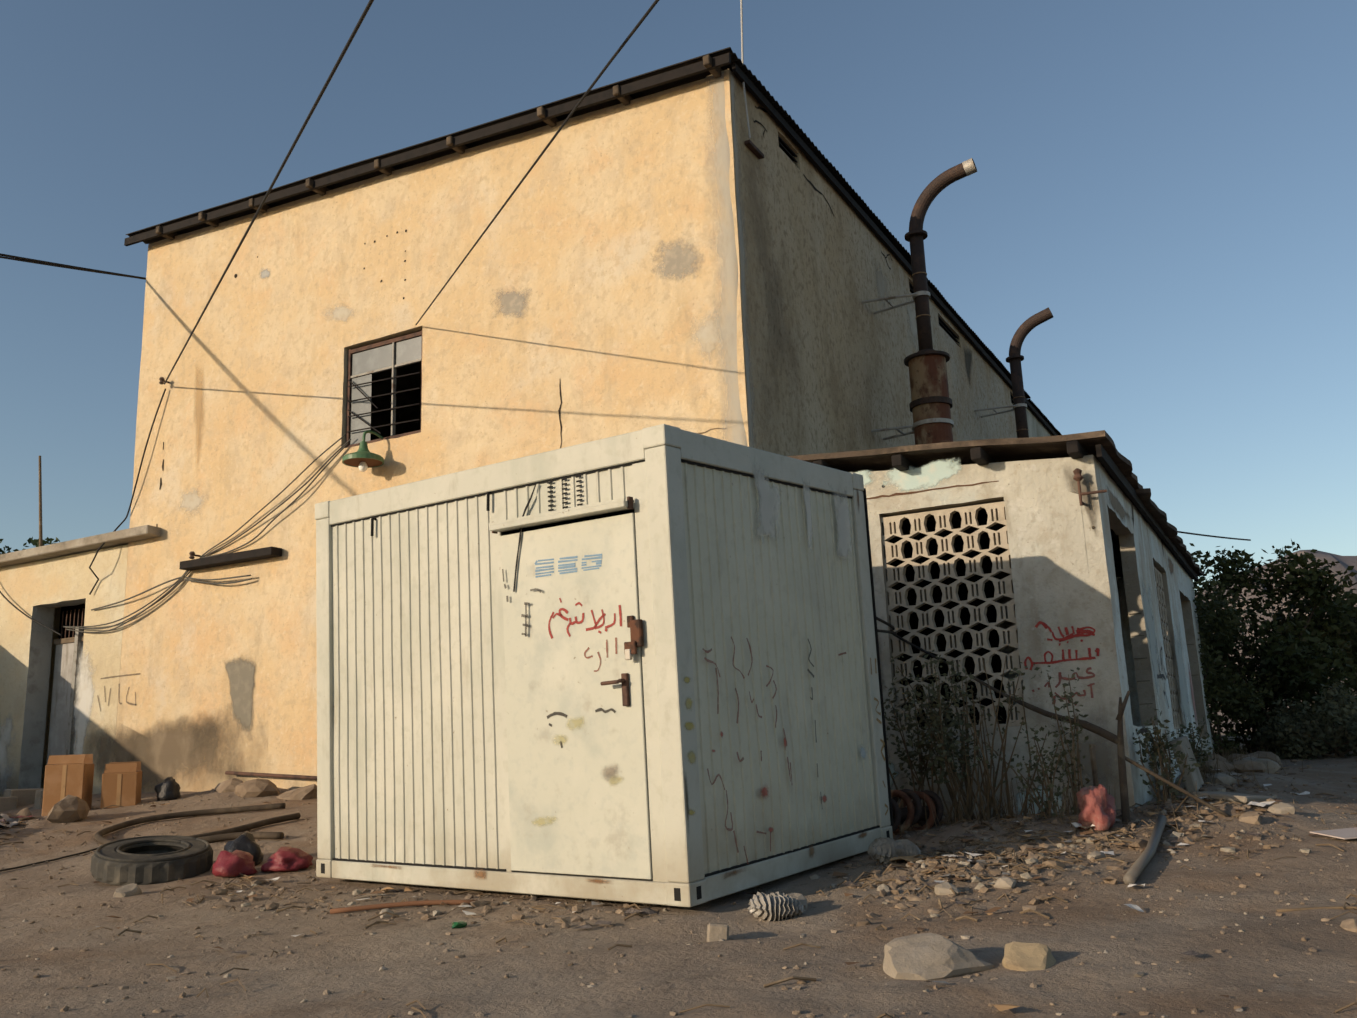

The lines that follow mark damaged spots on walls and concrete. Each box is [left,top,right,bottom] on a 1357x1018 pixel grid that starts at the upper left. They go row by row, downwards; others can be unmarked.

crack [556,382,564,448]
peeling [855,460,961,491]
leakage [90,721,239,791]